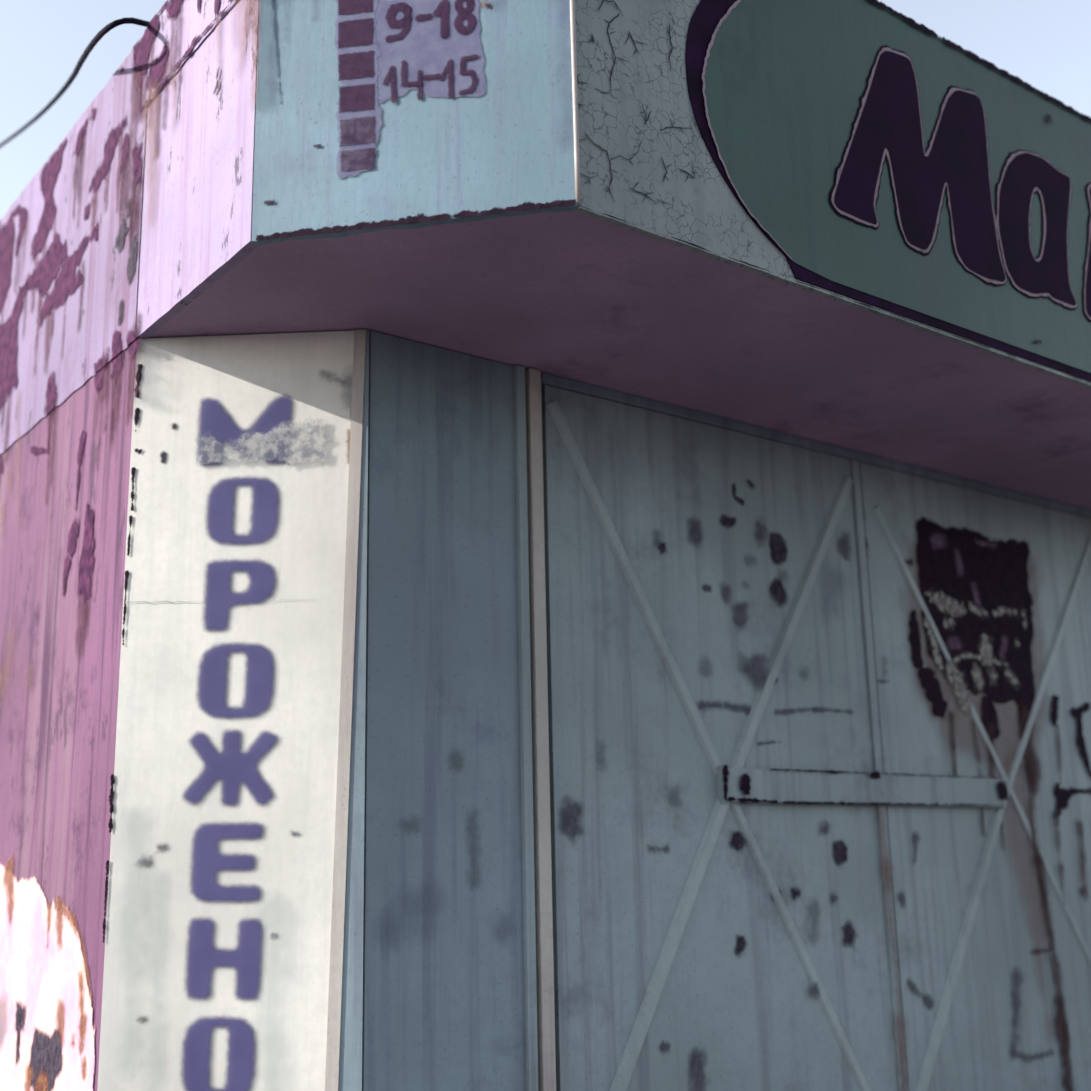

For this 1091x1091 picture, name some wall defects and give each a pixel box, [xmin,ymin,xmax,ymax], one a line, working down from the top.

crack [577,0,697,205]
corrosion [869,0,1091,121]
corrosion [0,0,234,501]
peeling [115,200,137,283]
corrosion [256,199,576,241]
peeling [134,364,143,432]
peeling [127,467,136,555]
peeling [755,522,788,564]
peeling [822,823,848,865]
corrosion [723,517,1073,1091]
corrosion [1051,695,1091,849]
peeling [0,864,95,1091]